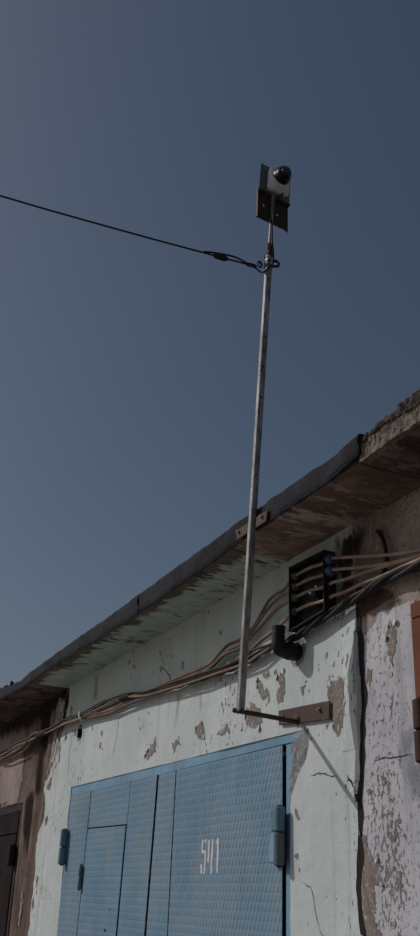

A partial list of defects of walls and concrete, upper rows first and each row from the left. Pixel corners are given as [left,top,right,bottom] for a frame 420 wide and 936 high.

water stain [0,689,69,854]
peeling [143,737,156,761]
peeling [194,720,205,740]
peeling [243,639,306,731]
flaking render [288,725,312,821]
peeling [326,677,345,737]
crack [311,587,412,936]
peeling [383,619,397,665]
peeling [359,832,383,936]
peeling [389,817,402,891]